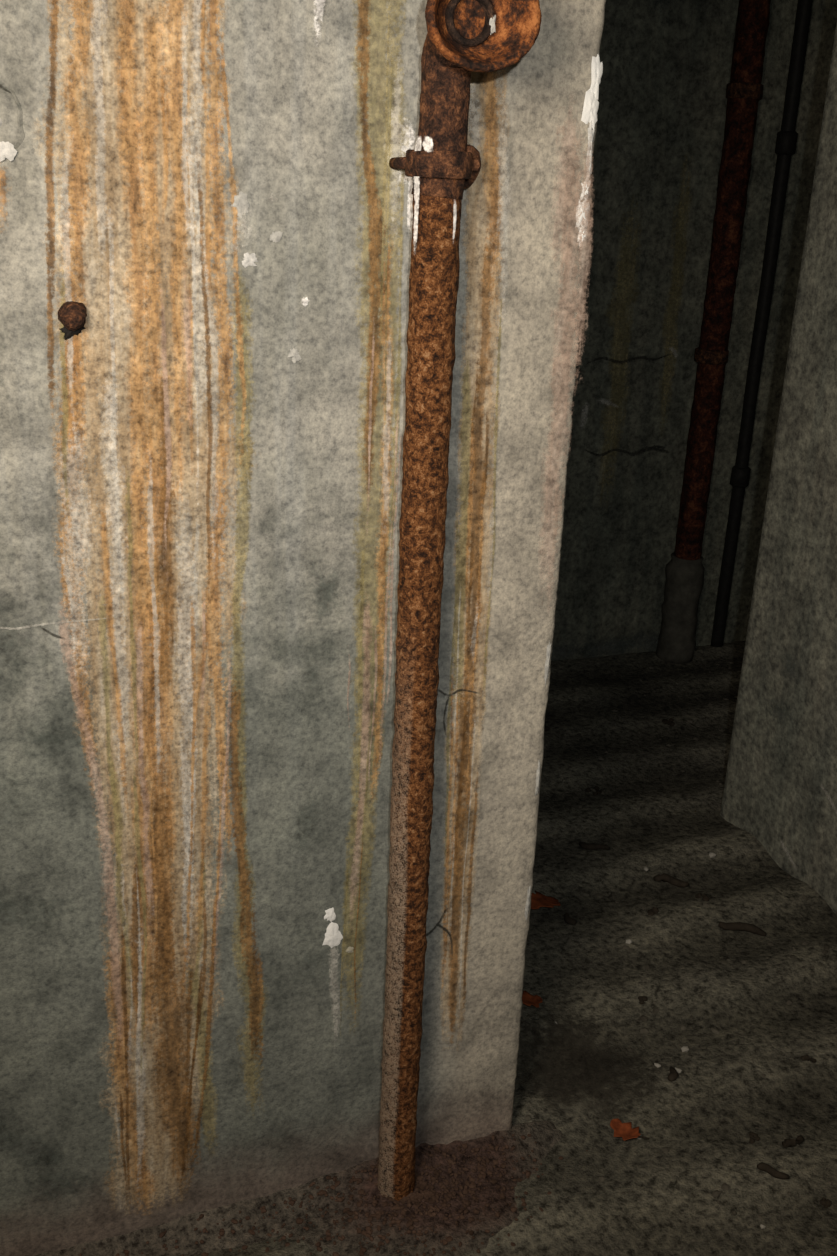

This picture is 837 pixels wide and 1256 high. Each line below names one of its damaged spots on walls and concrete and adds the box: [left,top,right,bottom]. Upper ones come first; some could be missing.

corrosion [38,0,263,1208]
corrosion [440,70,509,1043]